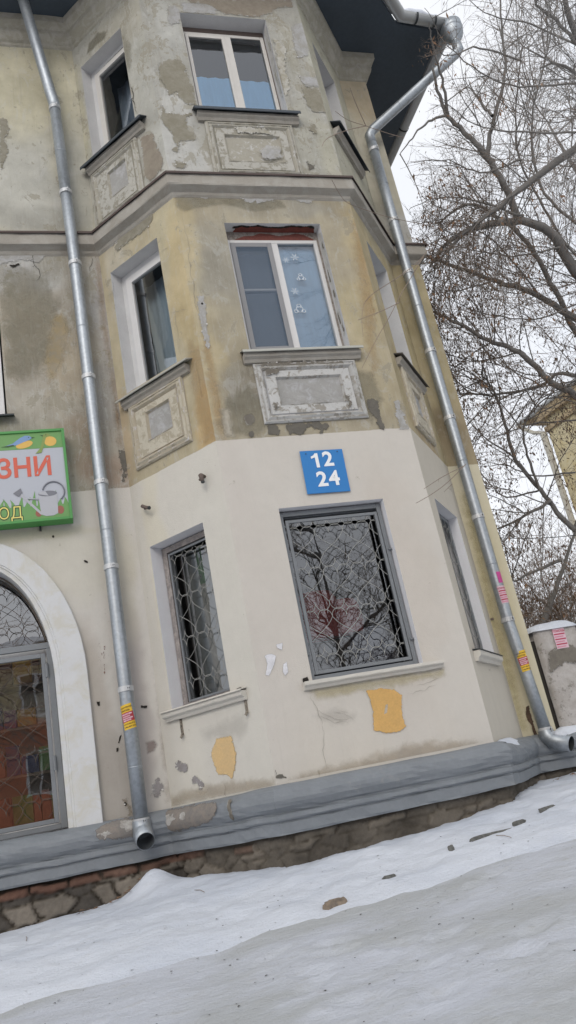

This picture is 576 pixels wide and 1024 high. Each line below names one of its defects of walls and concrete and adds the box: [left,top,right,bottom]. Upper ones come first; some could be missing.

peeling [272,22,326,135]
peeling [0,117,10,169]
peeling [140,58,197,181]
peeling [175,760,204,790]
peeling [96,798,134,841]
peeling [166,802,217,832]